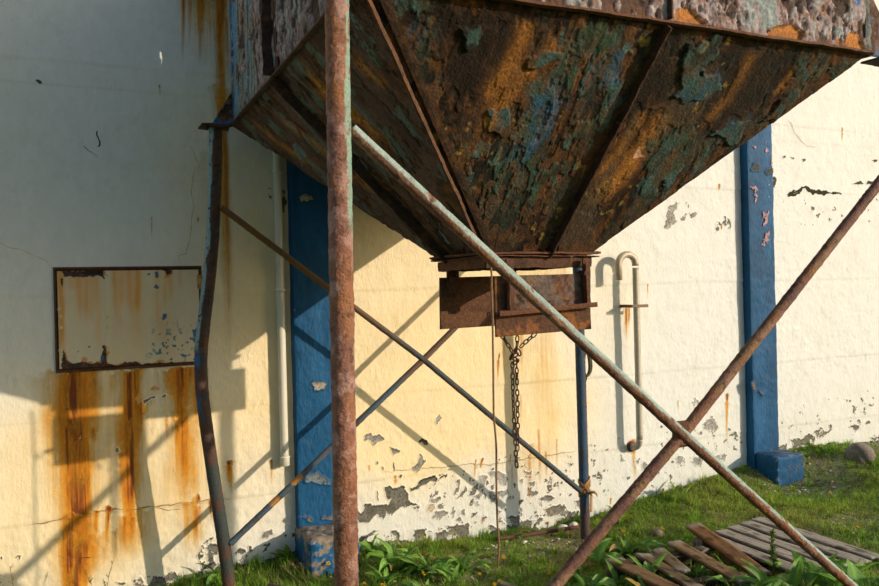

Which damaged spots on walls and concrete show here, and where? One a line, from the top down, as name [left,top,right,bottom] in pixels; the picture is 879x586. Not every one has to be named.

rust [182,0,227,115]
rust [221,131,229,260]
peeling [664,202,697,229]
rust [43,368,147,586]
rust [164,367,212,540]
peeling [363,432,401,457]
peeling [358,437,580,545]
peeling [694,415,744,462]
peeling [779,416,834,450]
peeling [828,390,874,436]
peeling [114,534,220,586]
peeling [234,528,296,568]